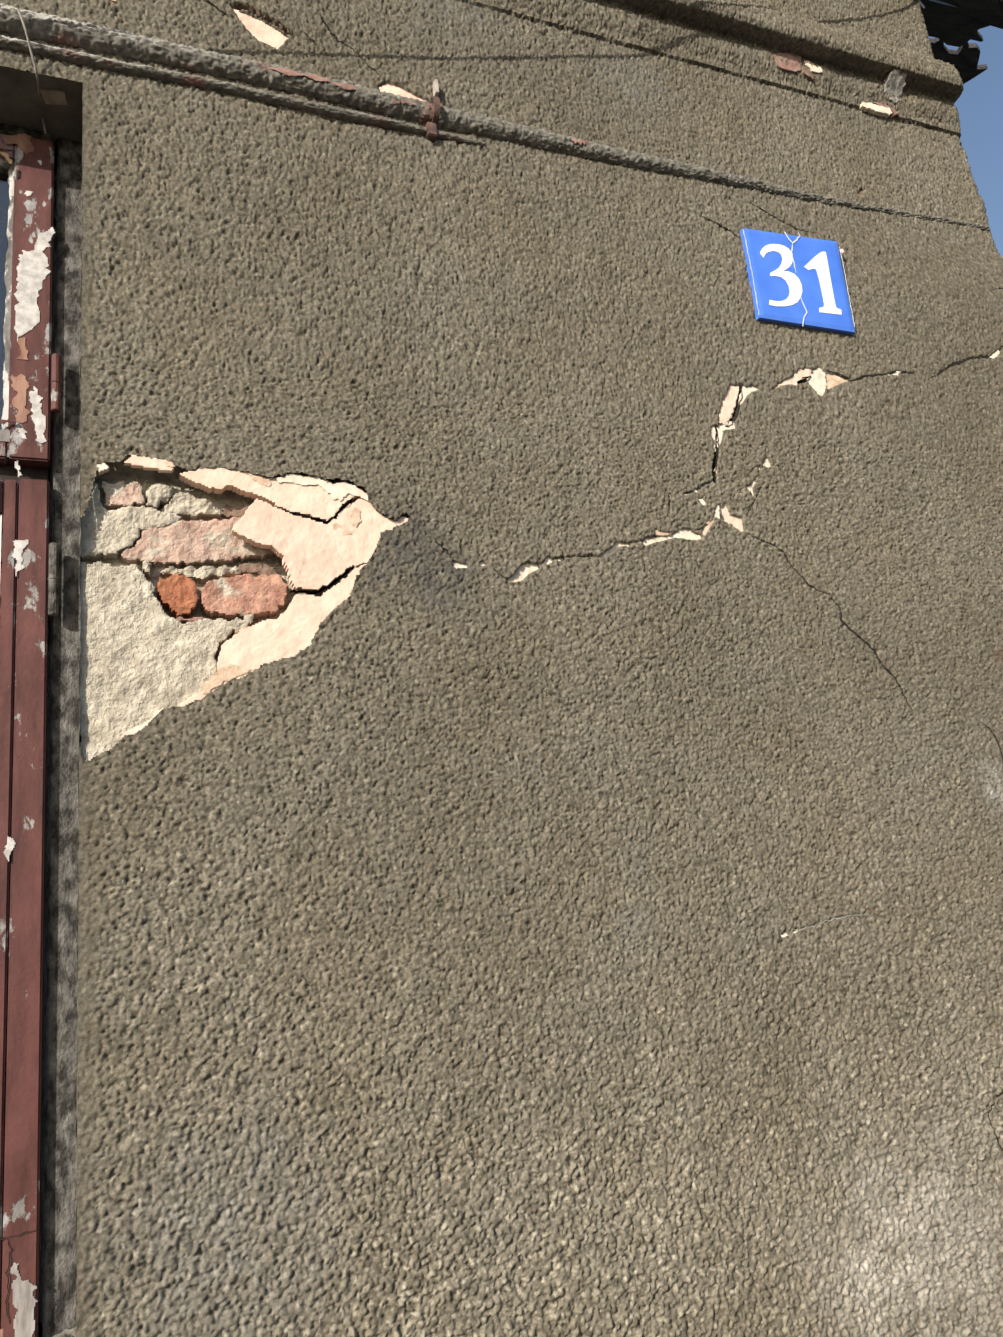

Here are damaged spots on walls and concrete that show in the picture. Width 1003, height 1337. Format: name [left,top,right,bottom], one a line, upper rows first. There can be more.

flaking render [233,5,292,49]
flaking render [773,53,823,82]
flaking render [377,83,432,105]
spalling [859,69,907,119]
peeling [0,227,55,443]
crack [847,346,1003,381]
peeling [11,540,29,577]
crack [437,384,914,712]
spalling [79,455,410,762]
peeling [3,836,16,862]
crack [988,1091,1003,1151]
peeling [0,1263,38,1337]